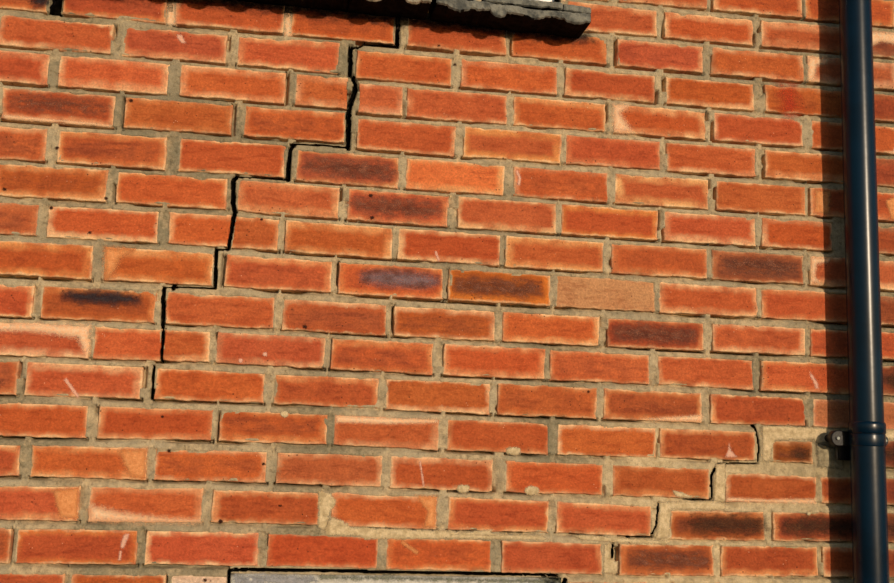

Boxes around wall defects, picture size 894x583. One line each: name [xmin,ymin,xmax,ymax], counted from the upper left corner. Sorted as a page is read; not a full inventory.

crack [151,21,400,399]
crack [684,425,760,501]
crack [611,502,659,558]